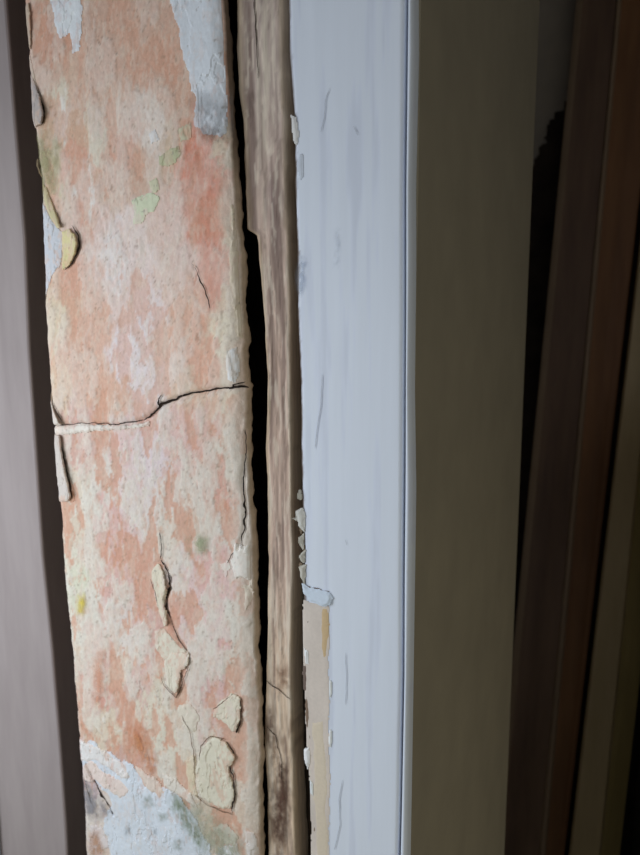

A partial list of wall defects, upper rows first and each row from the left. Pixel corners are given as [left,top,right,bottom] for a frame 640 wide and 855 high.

peeling [26,3,44,128]
peeling [50,0,83,54]
peeling [159,0,228,167]
peeling [291,115,304,180]
peeling [36,159,77,297]
peeling [51,392,150,502]
crack [52,0,291,855]
peeling [151,563,190,693]
spalling [220,543,255,610]
peeling [302,600,332,855]
leakage [84,785,105,815]
peeling [79,736,260,855]